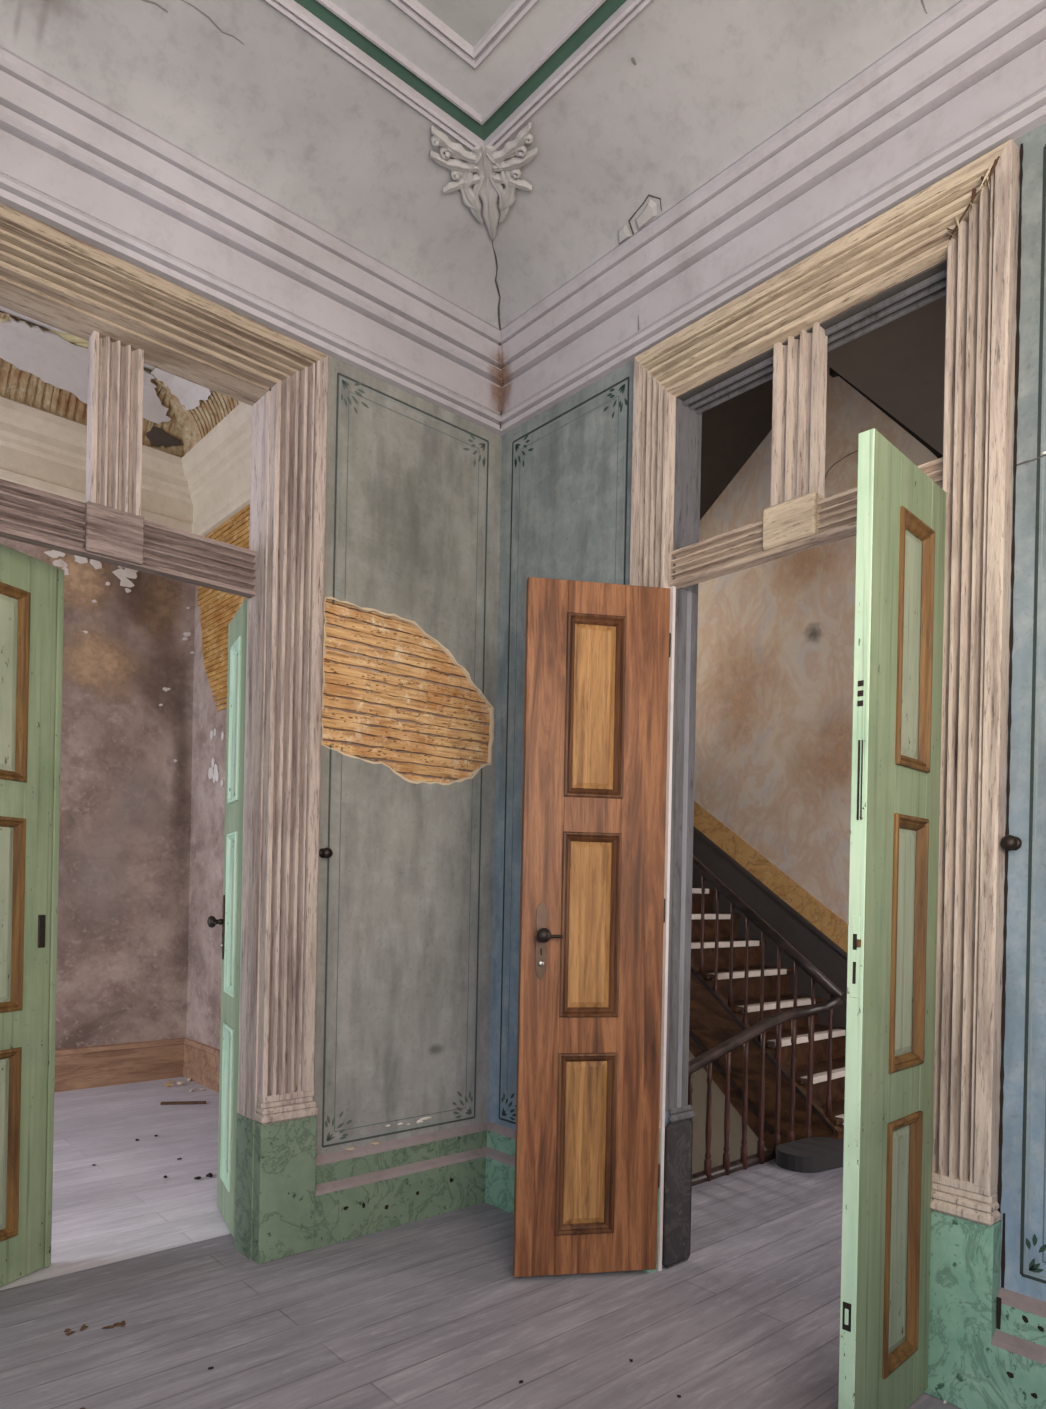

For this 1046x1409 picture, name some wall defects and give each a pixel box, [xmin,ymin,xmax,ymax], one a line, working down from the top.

crack [142,0,244,45]
peeling [0,316,89,404]
crack [492,240,504,429]
peeling [143,368,212,448]
flaking render [205,504,250,549]
peeling [44,550,246,711]
flaking render [321,597,494,785]
peeling [208,758,224,787]